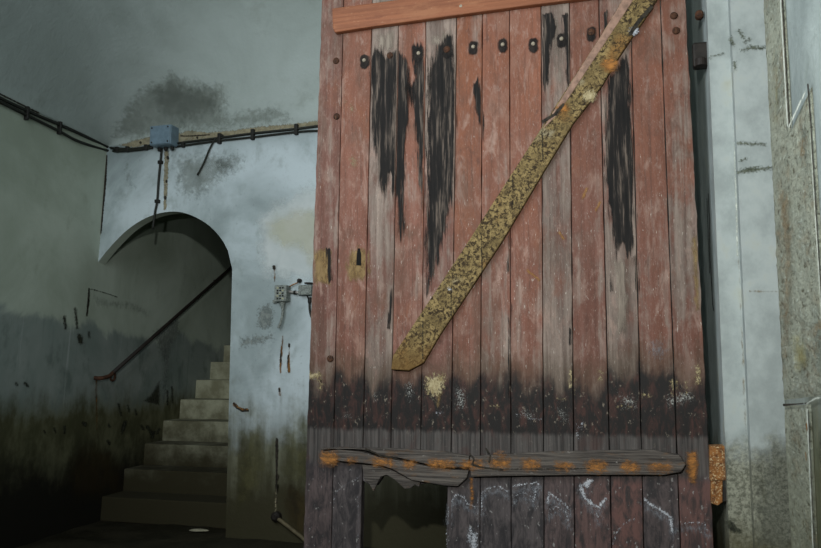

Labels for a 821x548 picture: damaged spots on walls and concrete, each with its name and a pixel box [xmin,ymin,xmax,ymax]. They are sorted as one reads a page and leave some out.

corrosion [279,336,290,373]
leakage [289,489,305,531]